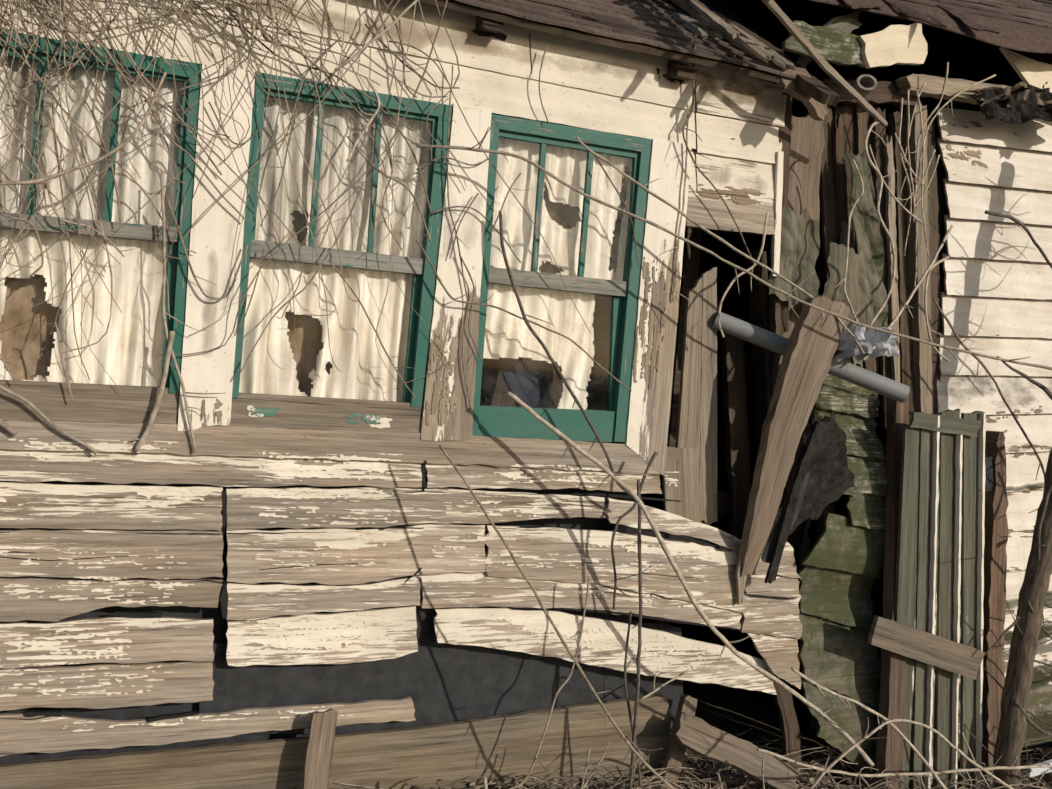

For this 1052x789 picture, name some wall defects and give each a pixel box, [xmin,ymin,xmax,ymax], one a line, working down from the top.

peeling [696,184,766,205]
peeling [633,257,668,390]
peeling [426,333,458,427]
peeling [8,438,178,460]
peeling [0,485,23,506]
crack [490,492,681,502]
crack [503,523,553,531]
crack [612,525,732,582]
peeling [0,547,195,605]
crack [459,607,739,630]
peeling [0,627,174,697]